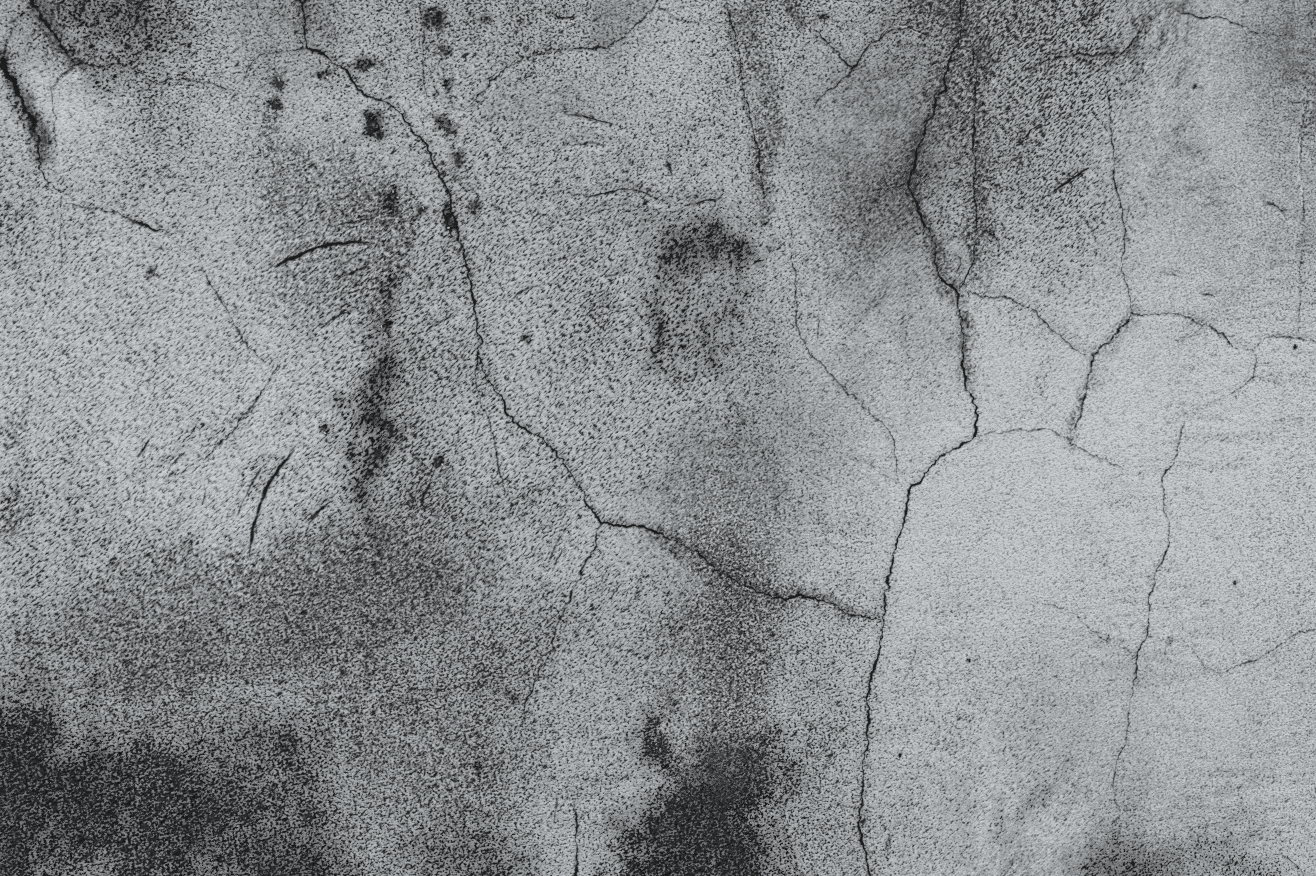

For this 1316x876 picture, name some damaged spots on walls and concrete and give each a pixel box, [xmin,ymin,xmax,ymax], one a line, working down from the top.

crack [0,0,234,272]
crack [1031,8,1286,67]
crack [201,268,278,468]
crack [245,0,1238,876]
crack [1236,335,1315,397]
damp [0,488,496,876]
damp [359,719,539,876]
damp [586,463,811,876]